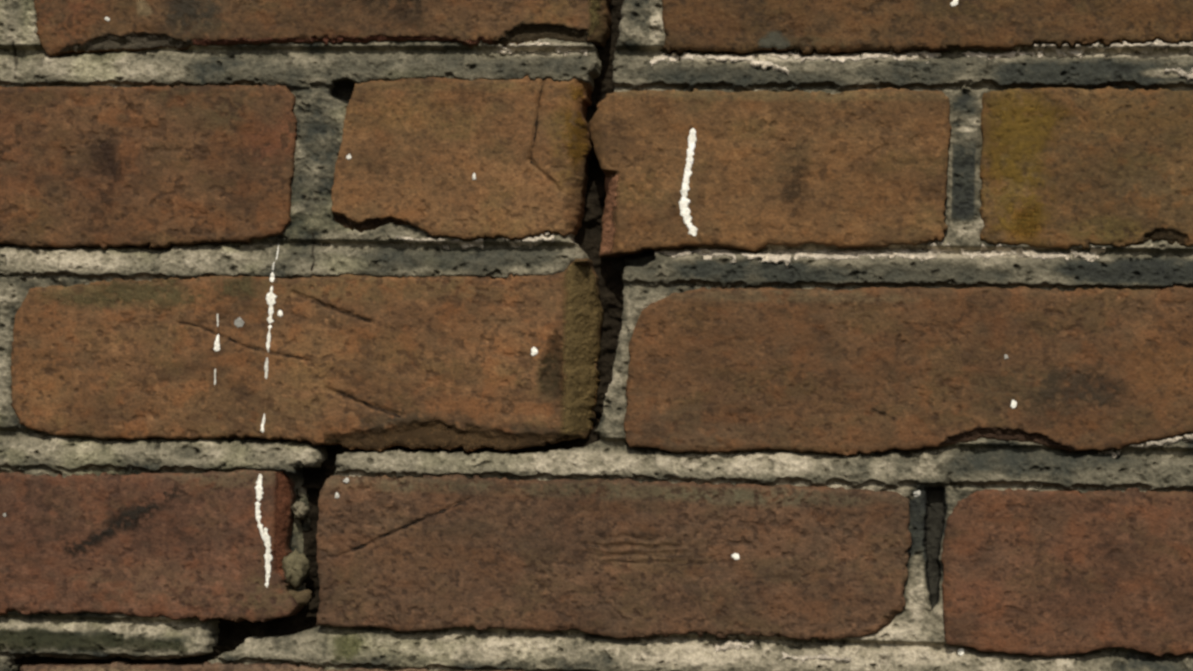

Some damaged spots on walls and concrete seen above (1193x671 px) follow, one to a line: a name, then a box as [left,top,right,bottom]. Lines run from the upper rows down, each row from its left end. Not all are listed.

crack [586,0,624,124]
crack [14,151,625,671]